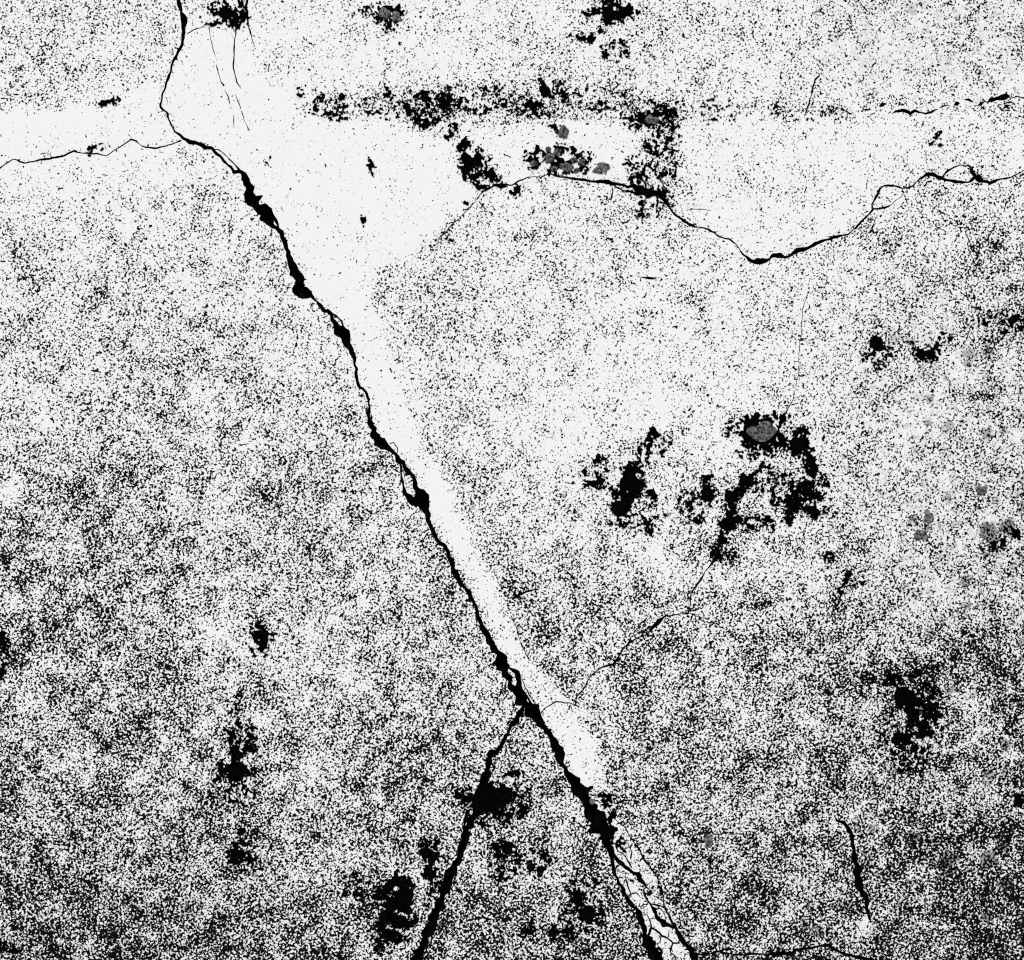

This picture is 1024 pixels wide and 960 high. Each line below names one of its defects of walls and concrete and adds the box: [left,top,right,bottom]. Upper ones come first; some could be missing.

crack [0,138,181,169]
crack [436,165,1024,265]
crack [159,0,875,960]